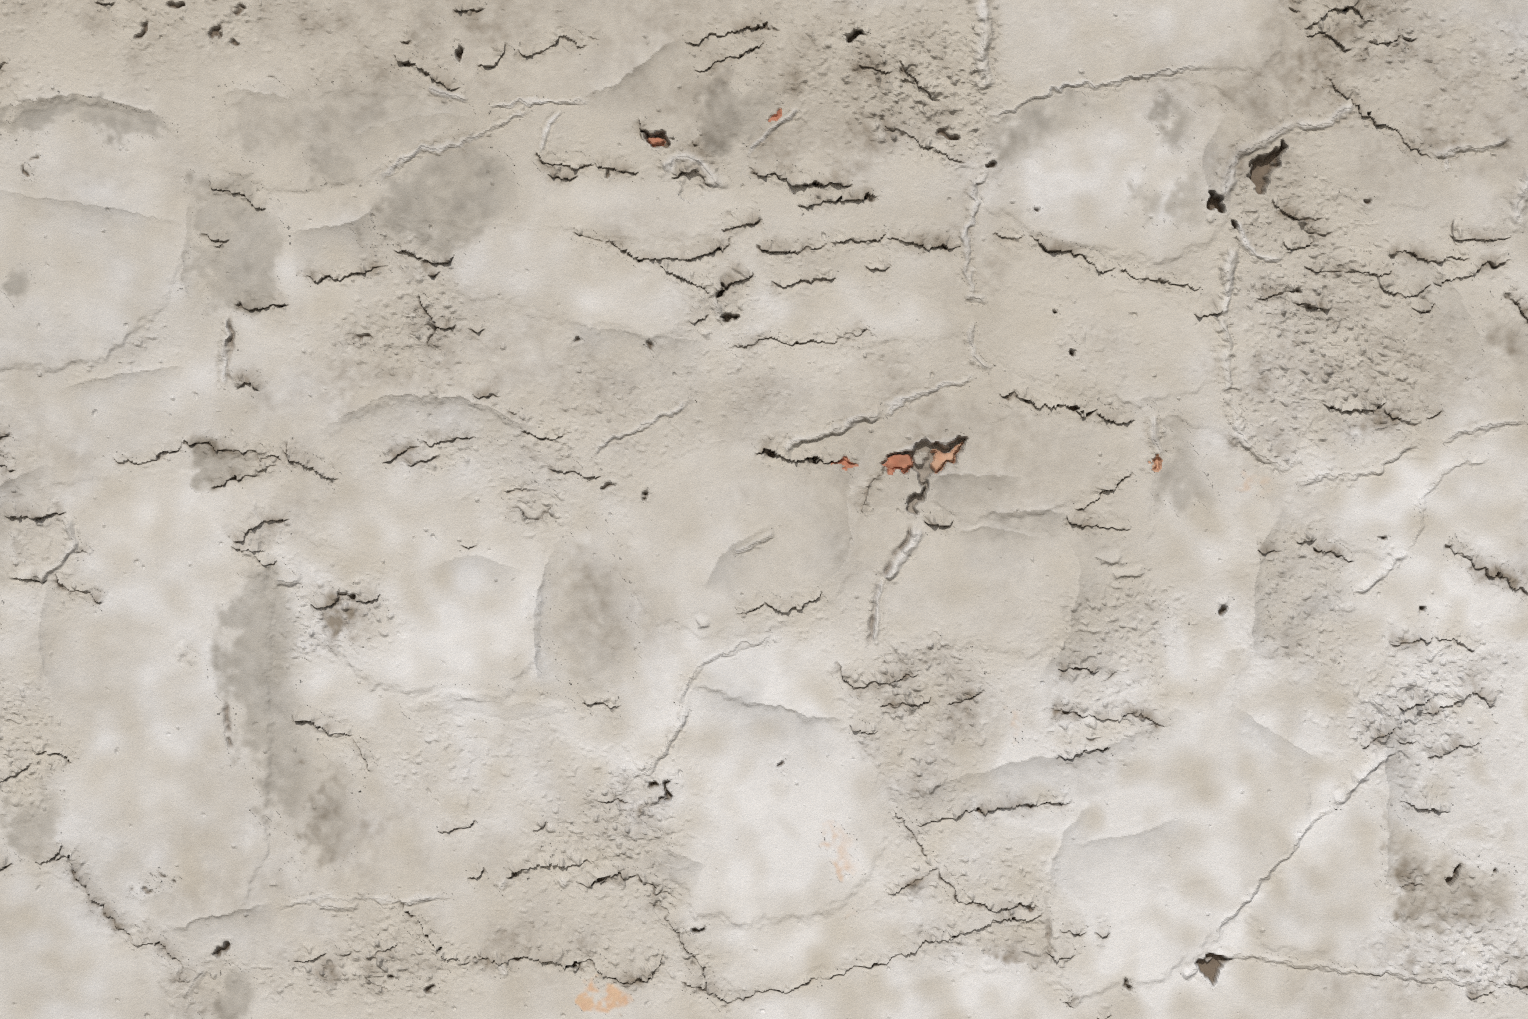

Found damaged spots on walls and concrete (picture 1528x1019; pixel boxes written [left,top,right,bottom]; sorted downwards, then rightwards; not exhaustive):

peeling [682,12,785,77]
peeling [1289,0,1419,62]
peeling [532,149,642,186]
peeling [632,118,882,216]
peeling [572,209,961,331]
spalling [1206,163,1513,474]
flaking render [882,433,964,475]
crack [1446,537,1528,606]
peeling [1388,631,1481,659]
spalling [828,635,987,740]
spalling [1354,682,1503,766]